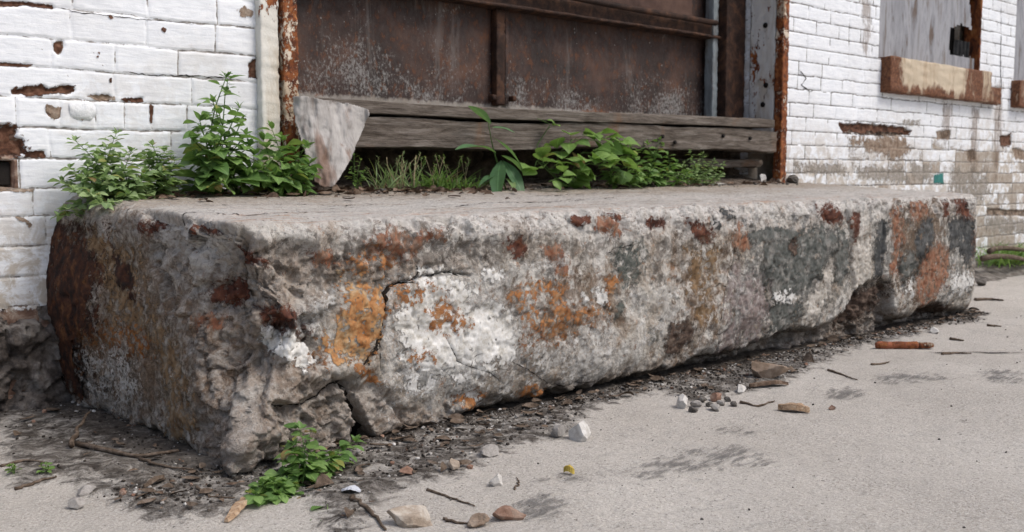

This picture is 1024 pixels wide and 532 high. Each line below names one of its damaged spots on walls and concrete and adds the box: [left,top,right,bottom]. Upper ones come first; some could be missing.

spalling [0,122,45,193]
spalling [11,78,154,123]
spalling [839,119,920,137]
corrosion [888,200,929,276]
corrosion [940,198,977,256]
corrosion [46,218,168,405]
corrosion [306,223,475,339]
corrosion [503,234,623,359]
corrosion [914,241,950,308]
crack [272,264,468,435]
corrosion [397,346,437,370]